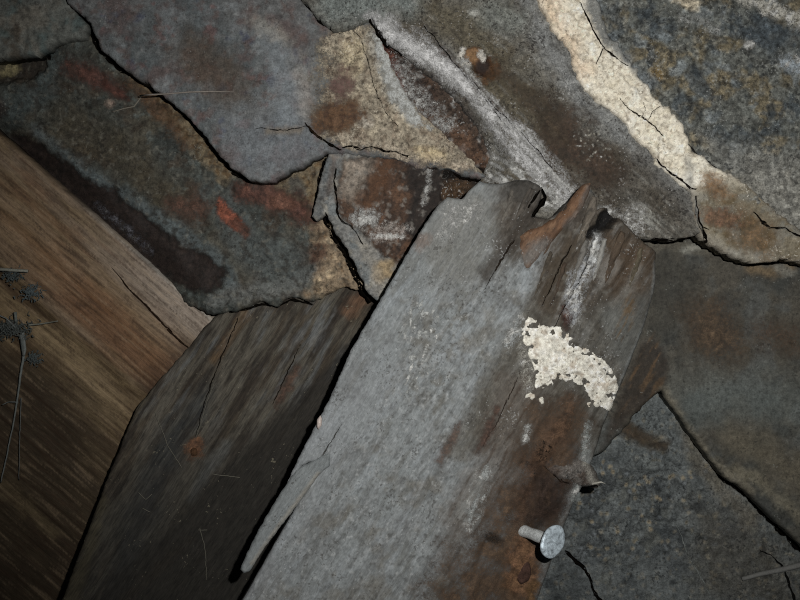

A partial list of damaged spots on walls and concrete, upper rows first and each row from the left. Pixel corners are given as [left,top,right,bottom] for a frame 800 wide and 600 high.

crack [580,2,628,66]
crack [79,14,260,185]
crack [620,98,663,136]
water stain [10,134,226,294]
rust [216,197,249,237]
crack [256,122,409,303]
crack [640,158,709,250]
crack [747,259,782,267]
crack [753,212,800,237]
rust [428,397,588,600]
crack [693,443,800,552]
crack [565,550,602,600]